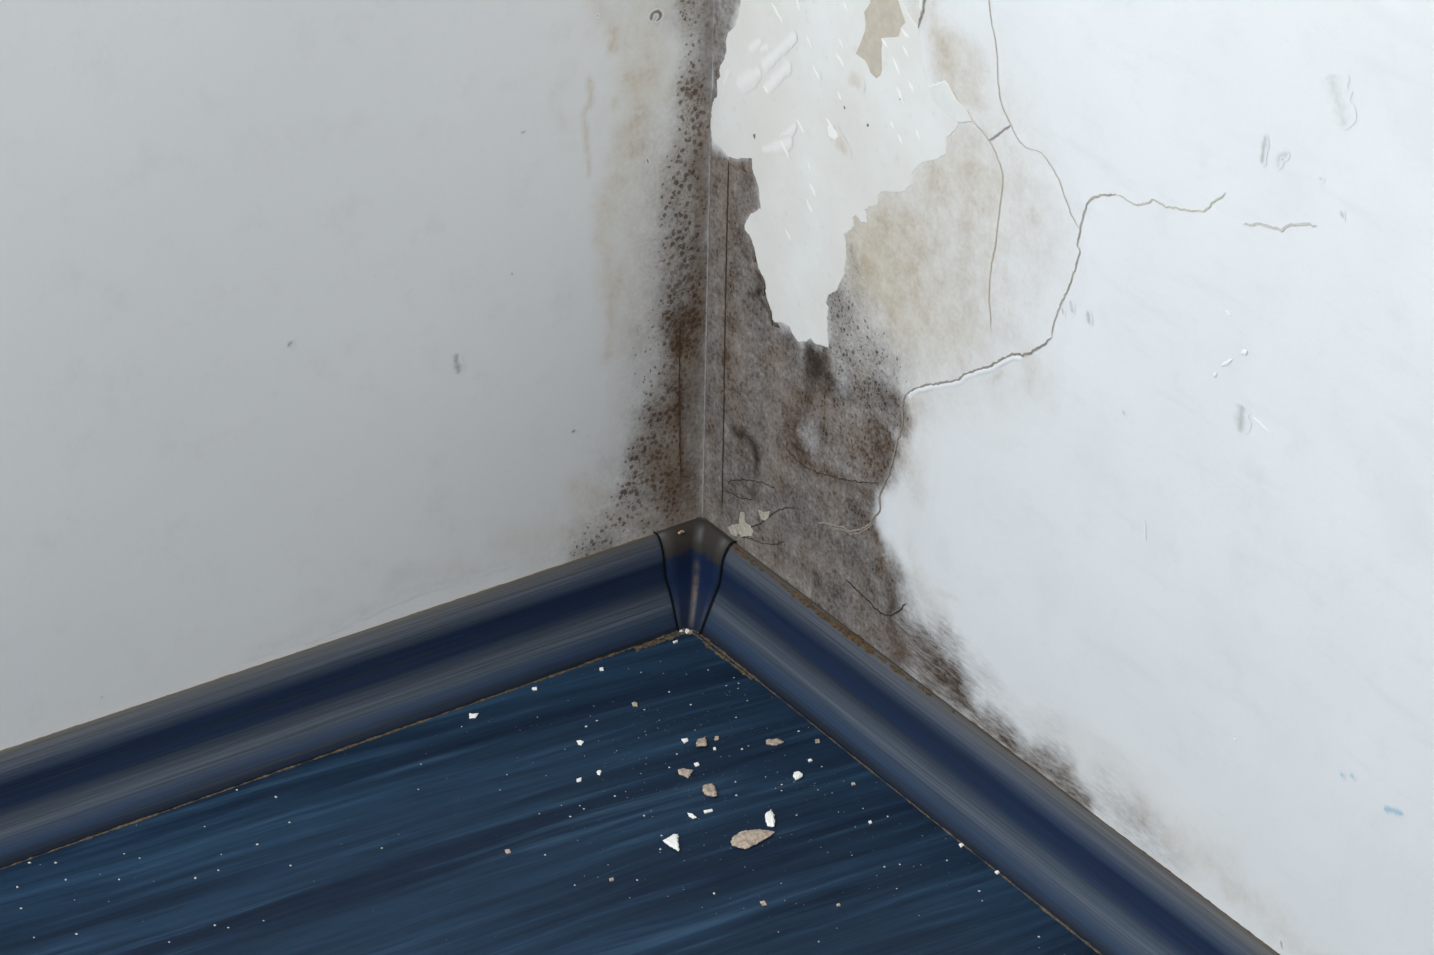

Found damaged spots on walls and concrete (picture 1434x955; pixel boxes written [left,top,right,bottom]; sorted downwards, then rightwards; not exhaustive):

crack [676,325,684,475]
water stain [247,0,1347,955]
peeling [711,0,974,347]
crack [845,579,907,616]
crack [722,0,1224,545]
crack [1243,222,1316,232]